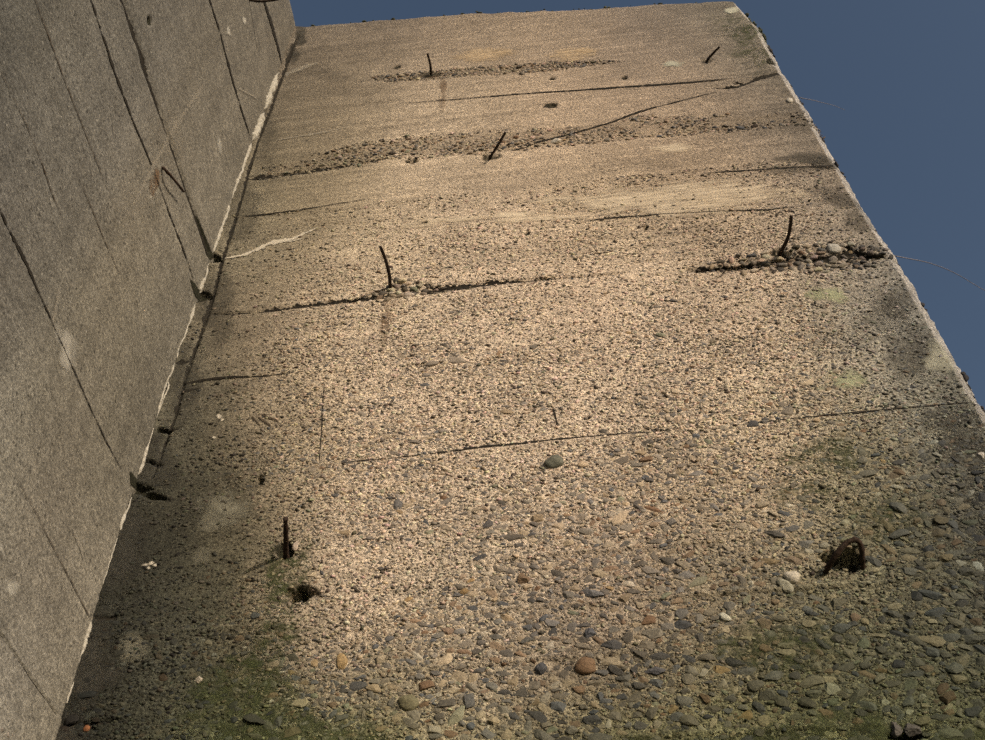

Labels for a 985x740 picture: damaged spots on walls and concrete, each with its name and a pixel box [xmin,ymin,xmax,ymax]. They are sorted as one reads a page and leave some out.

water stain [213,27,316,252]
crack [409,73,779,150]
crack [424,277,585,294]
water stain [137,304,195,479]
spalling [59,156,985,740]
water stain [103,497,139,584]
water stain [66,622,117,704]